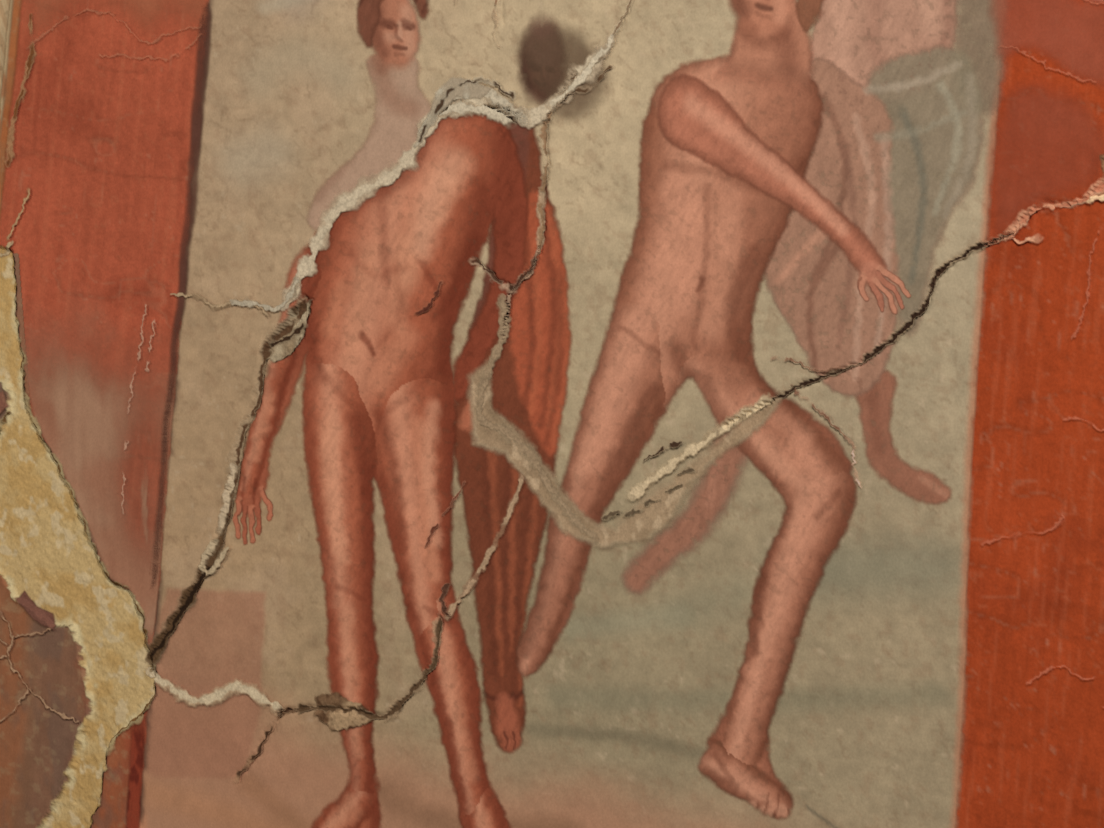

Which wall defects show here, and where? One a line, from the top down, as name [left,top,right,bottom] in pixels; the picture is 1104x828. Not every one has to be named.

spalling [419,77,490,133]
crack [418,77,514,142]
water stain [527,37,596,109]
crack [471,0,632,339]
crack [415,281,442,315]
crack [732,179,1104,447]
flaking render [0,246,156,828]
crack [146,293,307,666]
spalling [602,467,695,520]
crack [643,441,682,461]
crack [0,611,79,723]
crack [236,475,524,779]